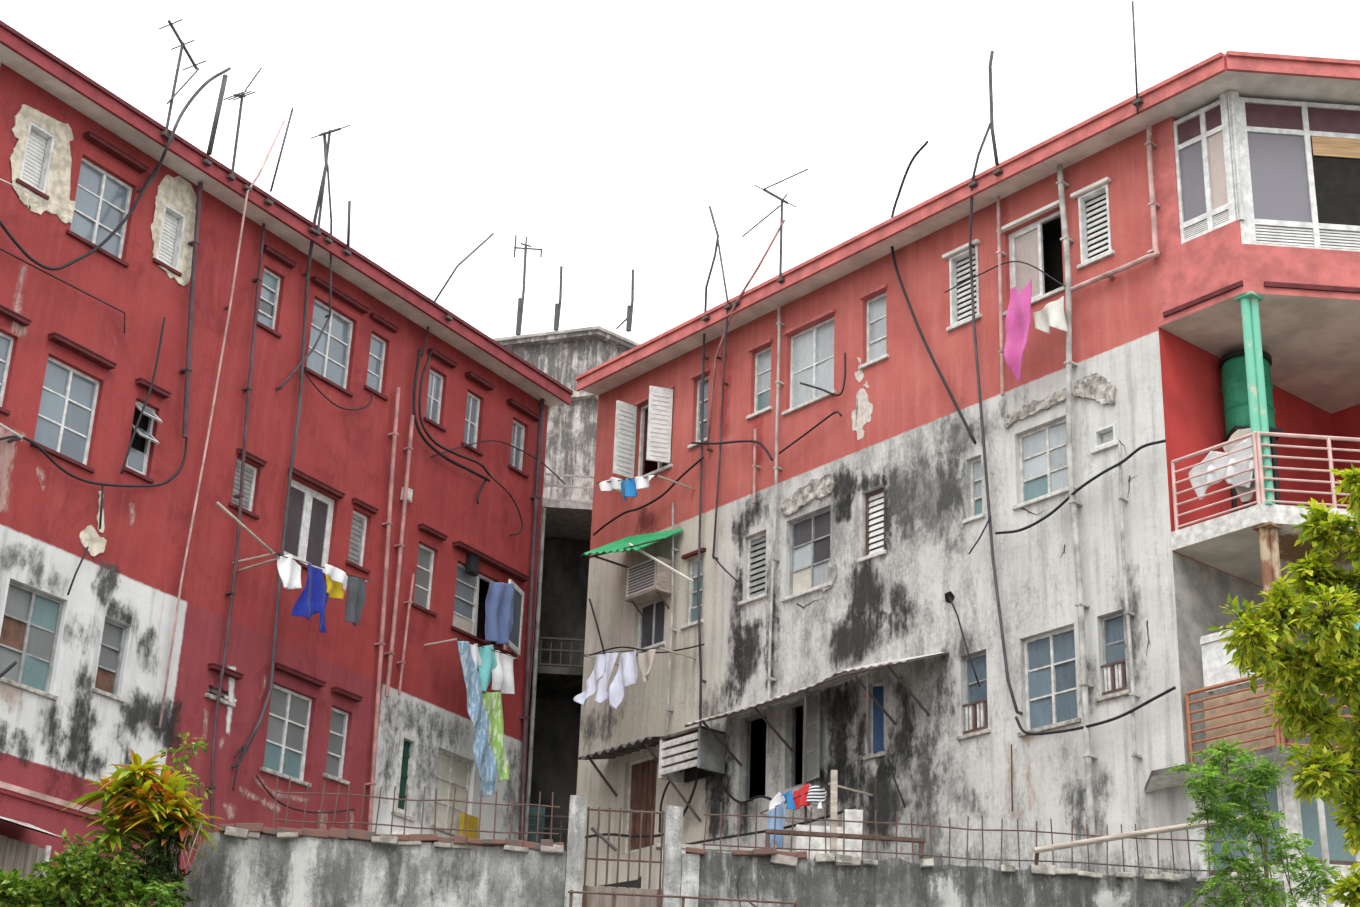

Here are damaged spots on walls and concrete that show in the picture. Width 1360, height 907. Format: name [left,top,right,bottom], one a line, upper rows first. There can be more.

flaking render [10,104,76,224]
flaking render [150,175,197,286]
peeling [852,357,873,441]
leakage [833,419,986,550]
leakage [0,625,107,794]
leakage [92,562,135,625]
leakage [117,689,182,777]
leakage [379,701,459,820]
leakage [703,492,779,838]
leakage [819,559,971,907]
leakage [1121,569,1140,690]
leakage [277,836,318,907]